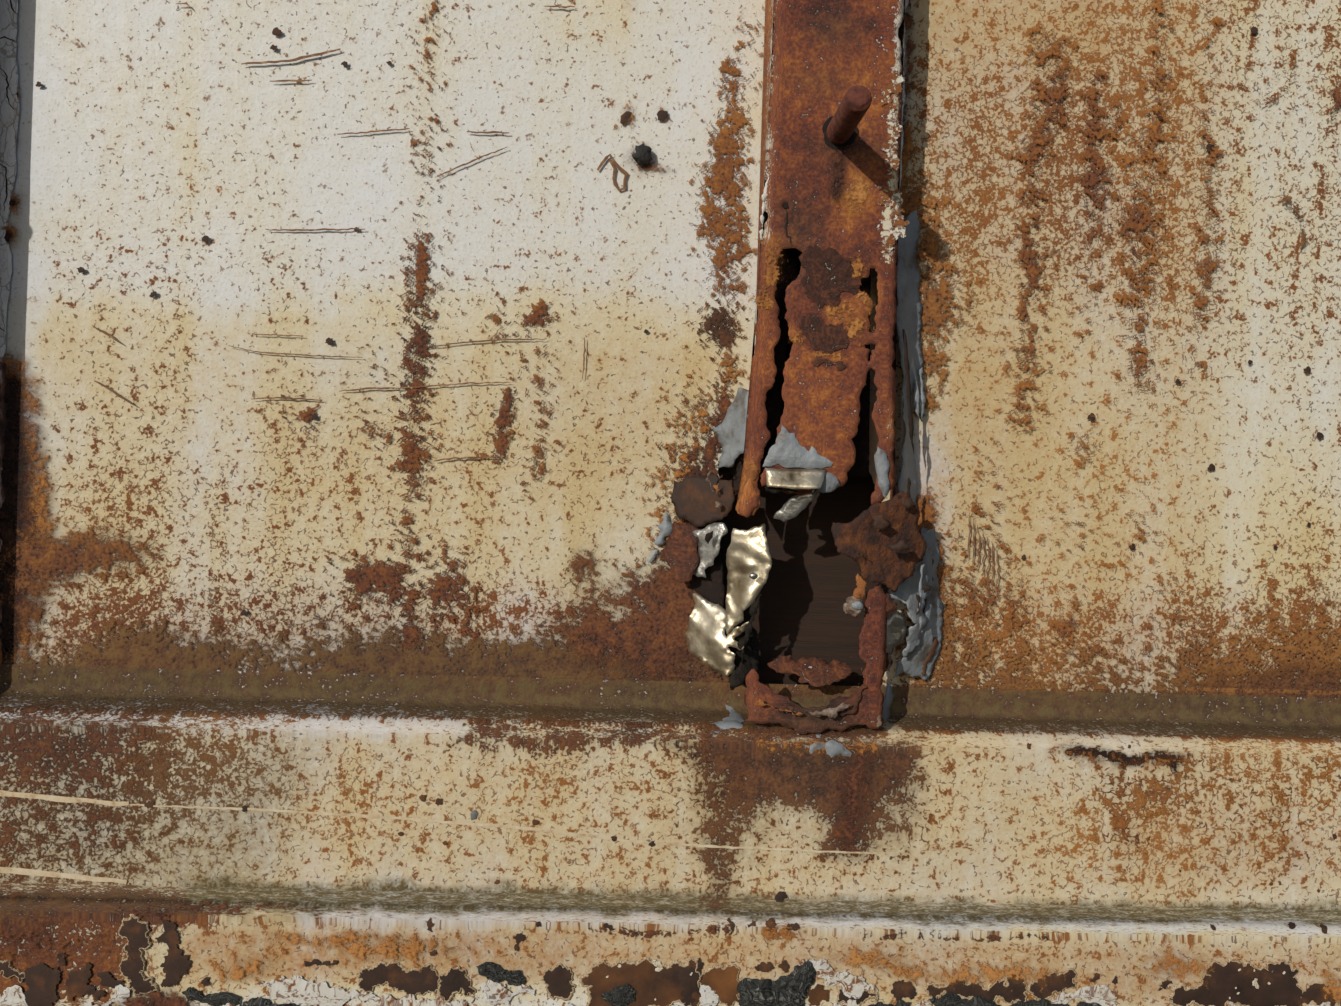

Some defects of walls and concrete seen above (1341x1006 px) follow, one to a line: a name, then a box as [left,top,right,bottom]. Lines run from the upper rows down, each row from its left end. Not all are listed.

rust [976,0,1226,503]
rust [313,0,487,650]
rust [530,7,875,683]
peeling [713,387,749,469]
peeling [874,447,890,499]
rust [0,698,177,905]
rust [448,684,931,910]
rust [1089,740,1341,885]
peeling [0,900,395,1006]
peeling [256,950,1118,1006]
peeling [583,918,800,940]
peeling [1154,959,1341,1006]